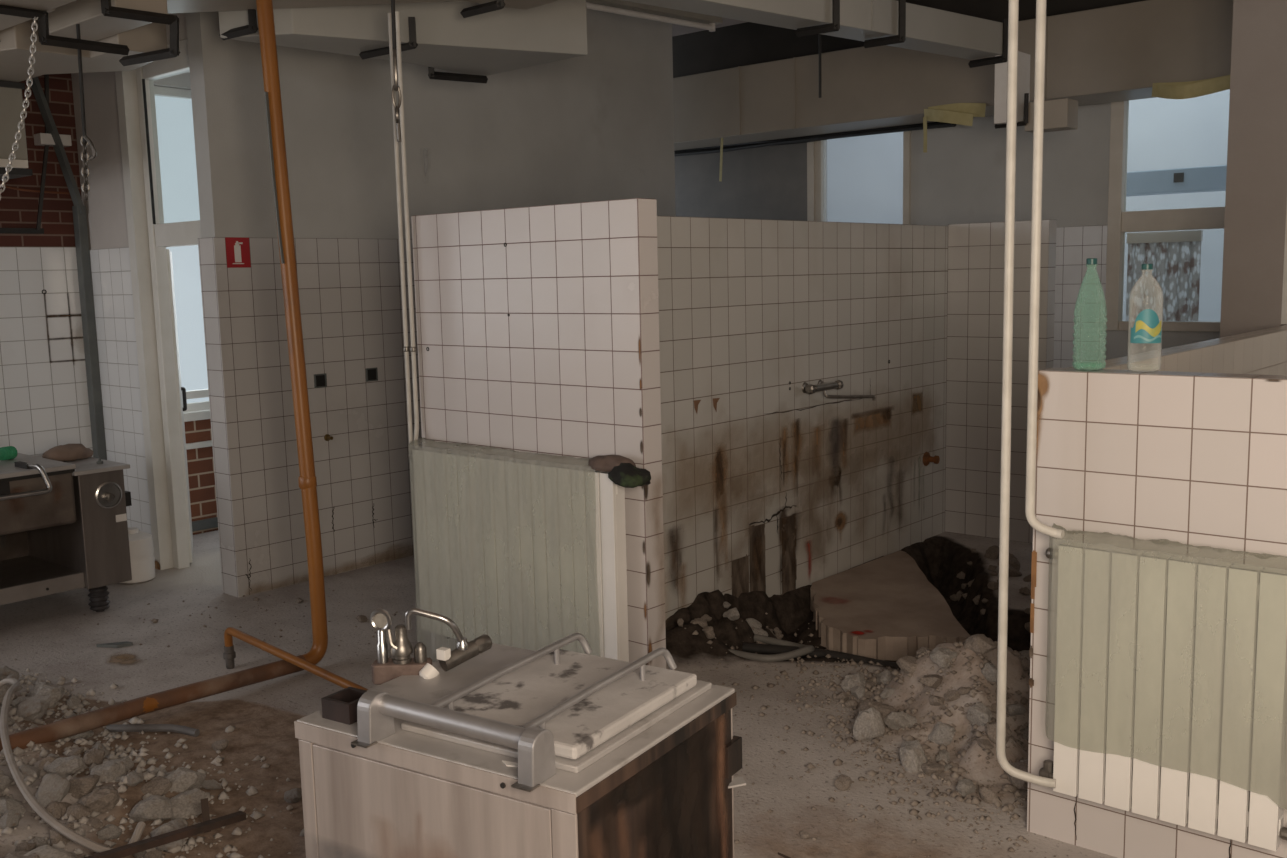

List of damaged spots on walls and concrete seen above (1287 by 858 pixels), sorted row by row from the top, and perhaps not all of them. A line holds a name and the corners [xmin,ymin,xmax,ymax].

damp [670,531,683,585]
peeling [731,509,797,598]